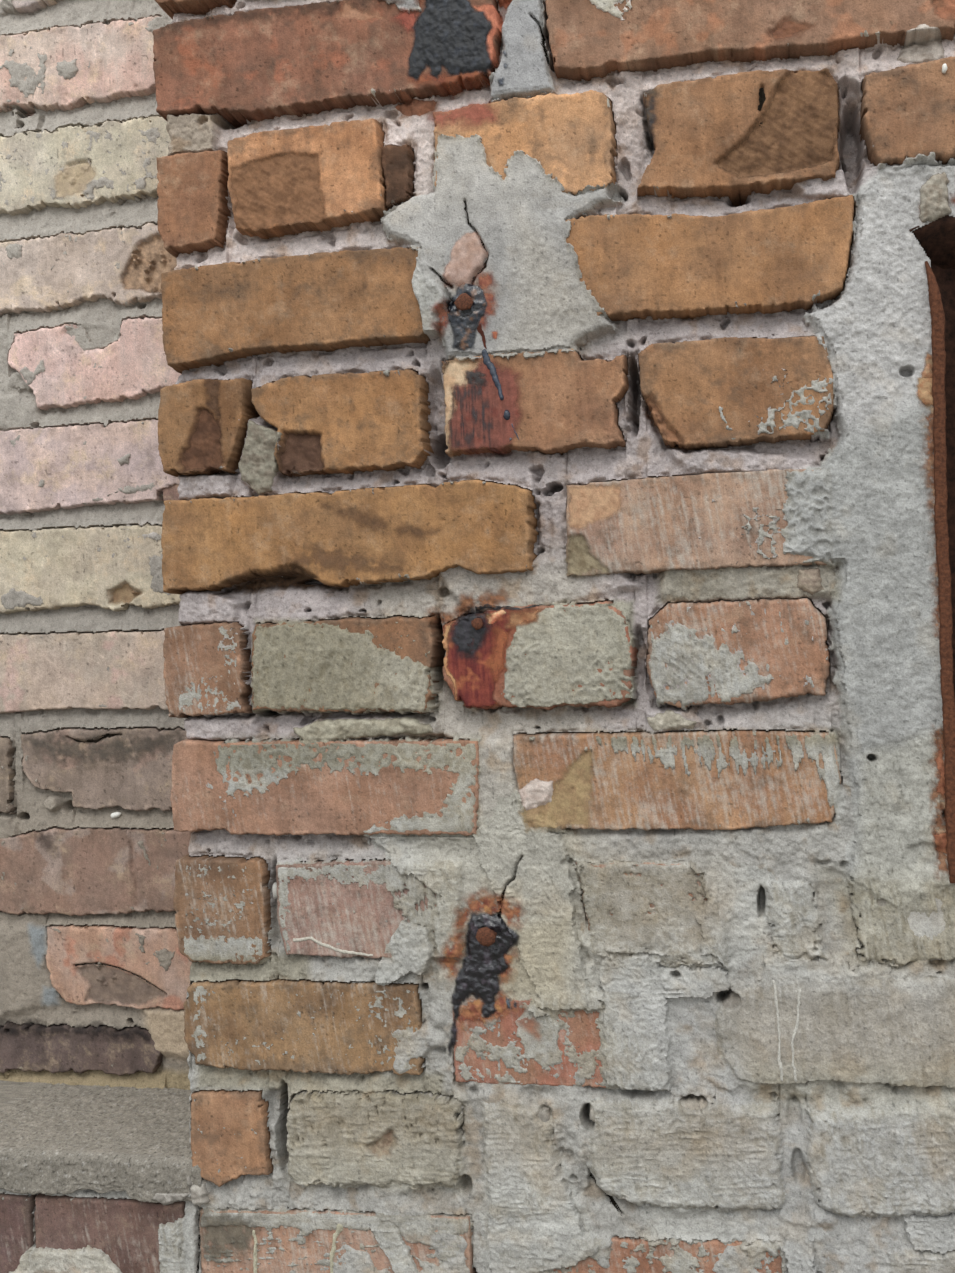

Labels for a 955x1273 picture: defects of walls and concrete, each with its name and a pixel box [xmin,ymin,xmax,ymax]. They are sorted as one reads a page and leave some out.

rust [396,0,512,124]
peeling [412,257,451,340]
rust [434,232,521,455]
rust [917,353,940,637]
rust [430,593,543,708]
spalling [521,751,593,828]
rust [930,729,949,872]
rust [440,895,538,1054]